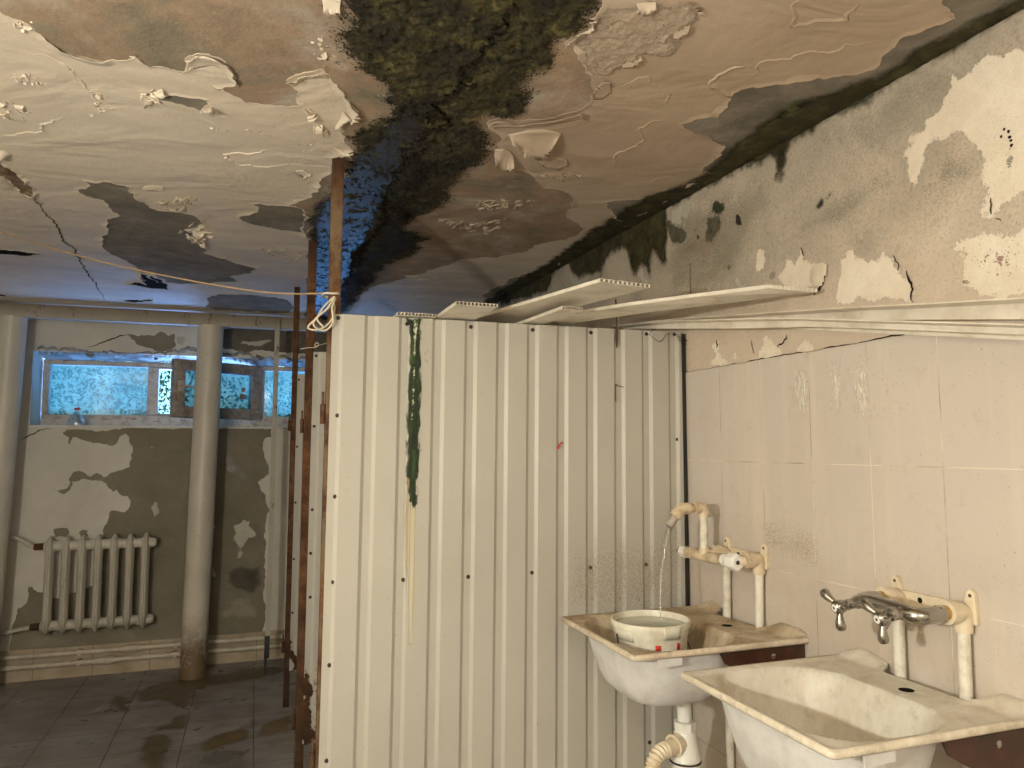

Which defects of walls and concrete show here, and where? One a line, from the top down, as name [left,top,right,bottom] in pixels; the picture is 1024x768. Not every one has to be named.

crack [34,199,105,300]
peeling [0,0,402,314]
leakage [287,0,602,320]
peeling [341,0,626,315]
leakage [484,0,1024,305]
crack [687,334,904,372]
crack [893,256,913,302]
flaking render [901,48,1024,299]
flaking render [8,425,193,651]
flaking render [208,424,272,635]
leakage [107,666,292,768]
corrosion [284,639,315,745]